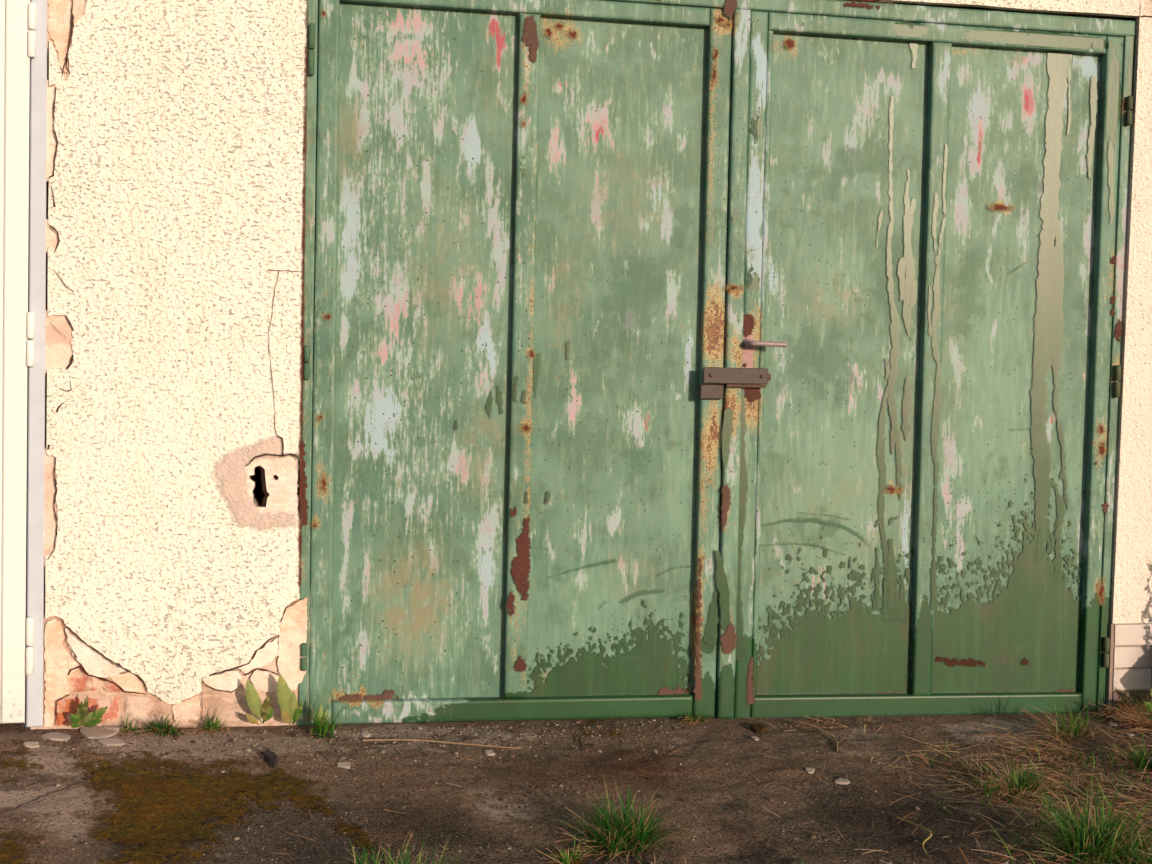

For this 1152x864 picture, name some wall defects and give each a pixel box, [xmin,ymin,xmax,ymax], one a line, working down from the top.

peeling [522,15,540,63]
spalling [46,0,87,255]
spalling [45,310,74,373]
peeling [743,314,756,337]
corrosion [744,387,762,402]
corrosion [1095,423,1106,465]
spalling [216,435,300,529]
peeling [510,517,531,596]
corrosion [506,591,529,616]
spalling [30,597,310,729]
corrosion [513,656,527,672]
corrosion [934,656,986,668]